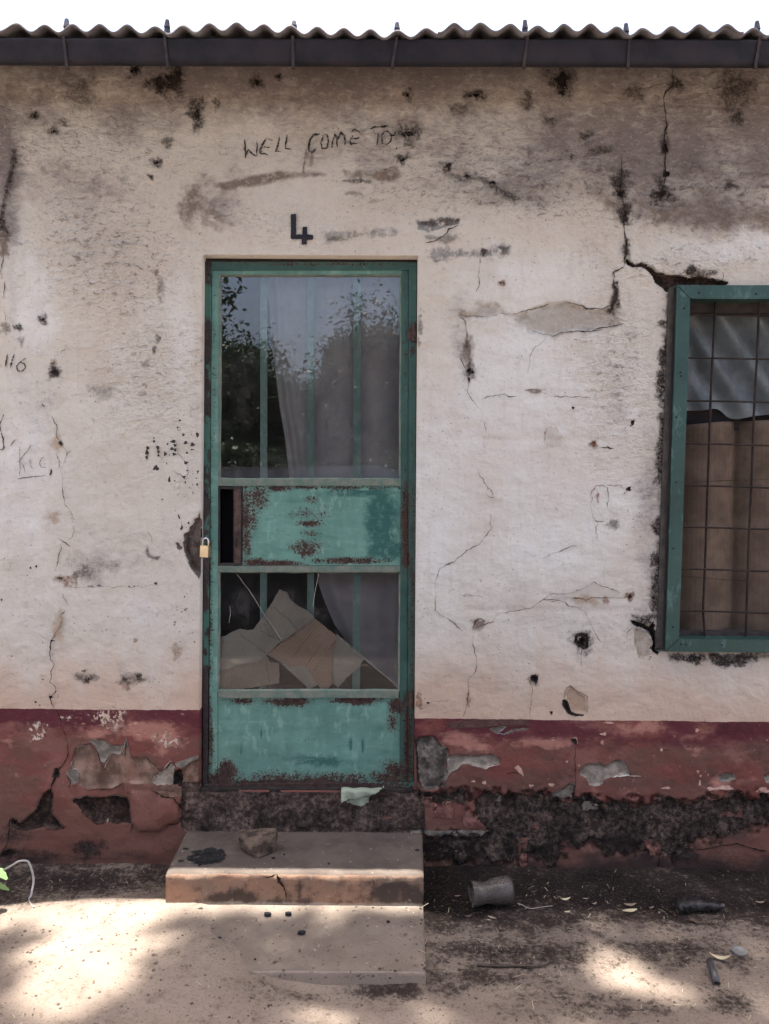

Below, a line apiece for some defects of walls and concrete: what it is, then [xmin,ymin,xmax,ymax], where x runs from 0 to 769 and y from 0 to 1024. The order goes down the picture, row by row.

damp [129,66,221,133]
crack [661,69,684,191]
crack [607,157,631,315]
crack [459,315,586,428]
damp [654,296,668,483]
spalling [176,513,202,579]
crack [435,476,618,716]
spalling [629,614,660,660]
damp [650,498,661,611]
damp [669,653,769,667]
spalling [10,789,65,831]
spalling [66,707,769,867]